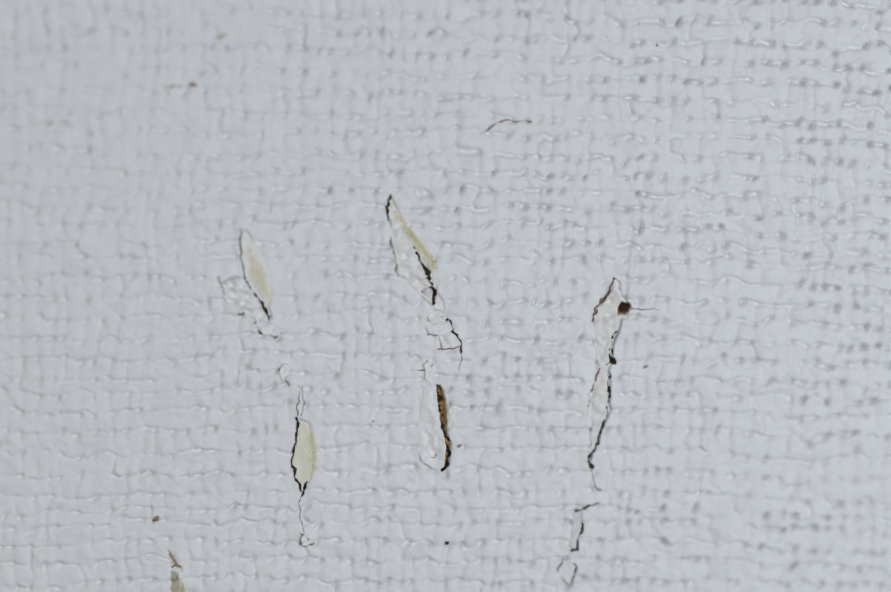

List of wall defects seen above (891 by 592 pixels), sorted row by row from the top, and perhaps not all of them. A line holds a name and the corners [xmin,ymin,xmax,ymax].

peeling [218,228,282,339]
peeling [385,194,463,371]
peeling [291,386,315,547]
peeling [413,361,451,472]
peeling [557,503,599,584]
peeling [587,277,656,491]